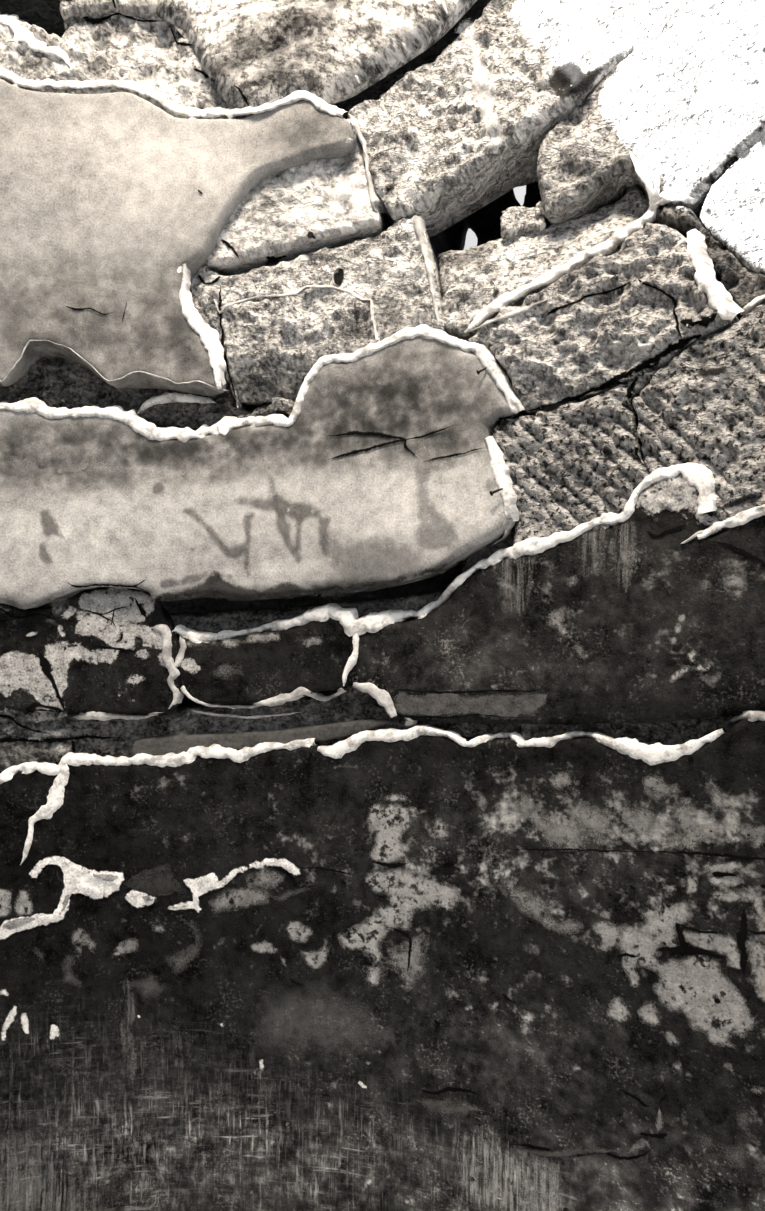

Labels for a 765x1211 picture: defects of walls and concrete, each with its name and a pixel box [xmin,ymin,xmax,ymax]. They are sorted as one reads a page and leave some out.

spalling [548,57,614,99]
spalling [699,154,739,185]
crack [526,278,717,467]
crack [328,425,482,461]
peeling [180,643,200,674]
peeling [223,633,279,647]
peeling [0,606,165,754]
peeling [0,889,35,930]
peeling [88,864,186,908]
peeling [212,868,294,911]
peeling [114,940,137,955]
peeling [252,942,285,963]